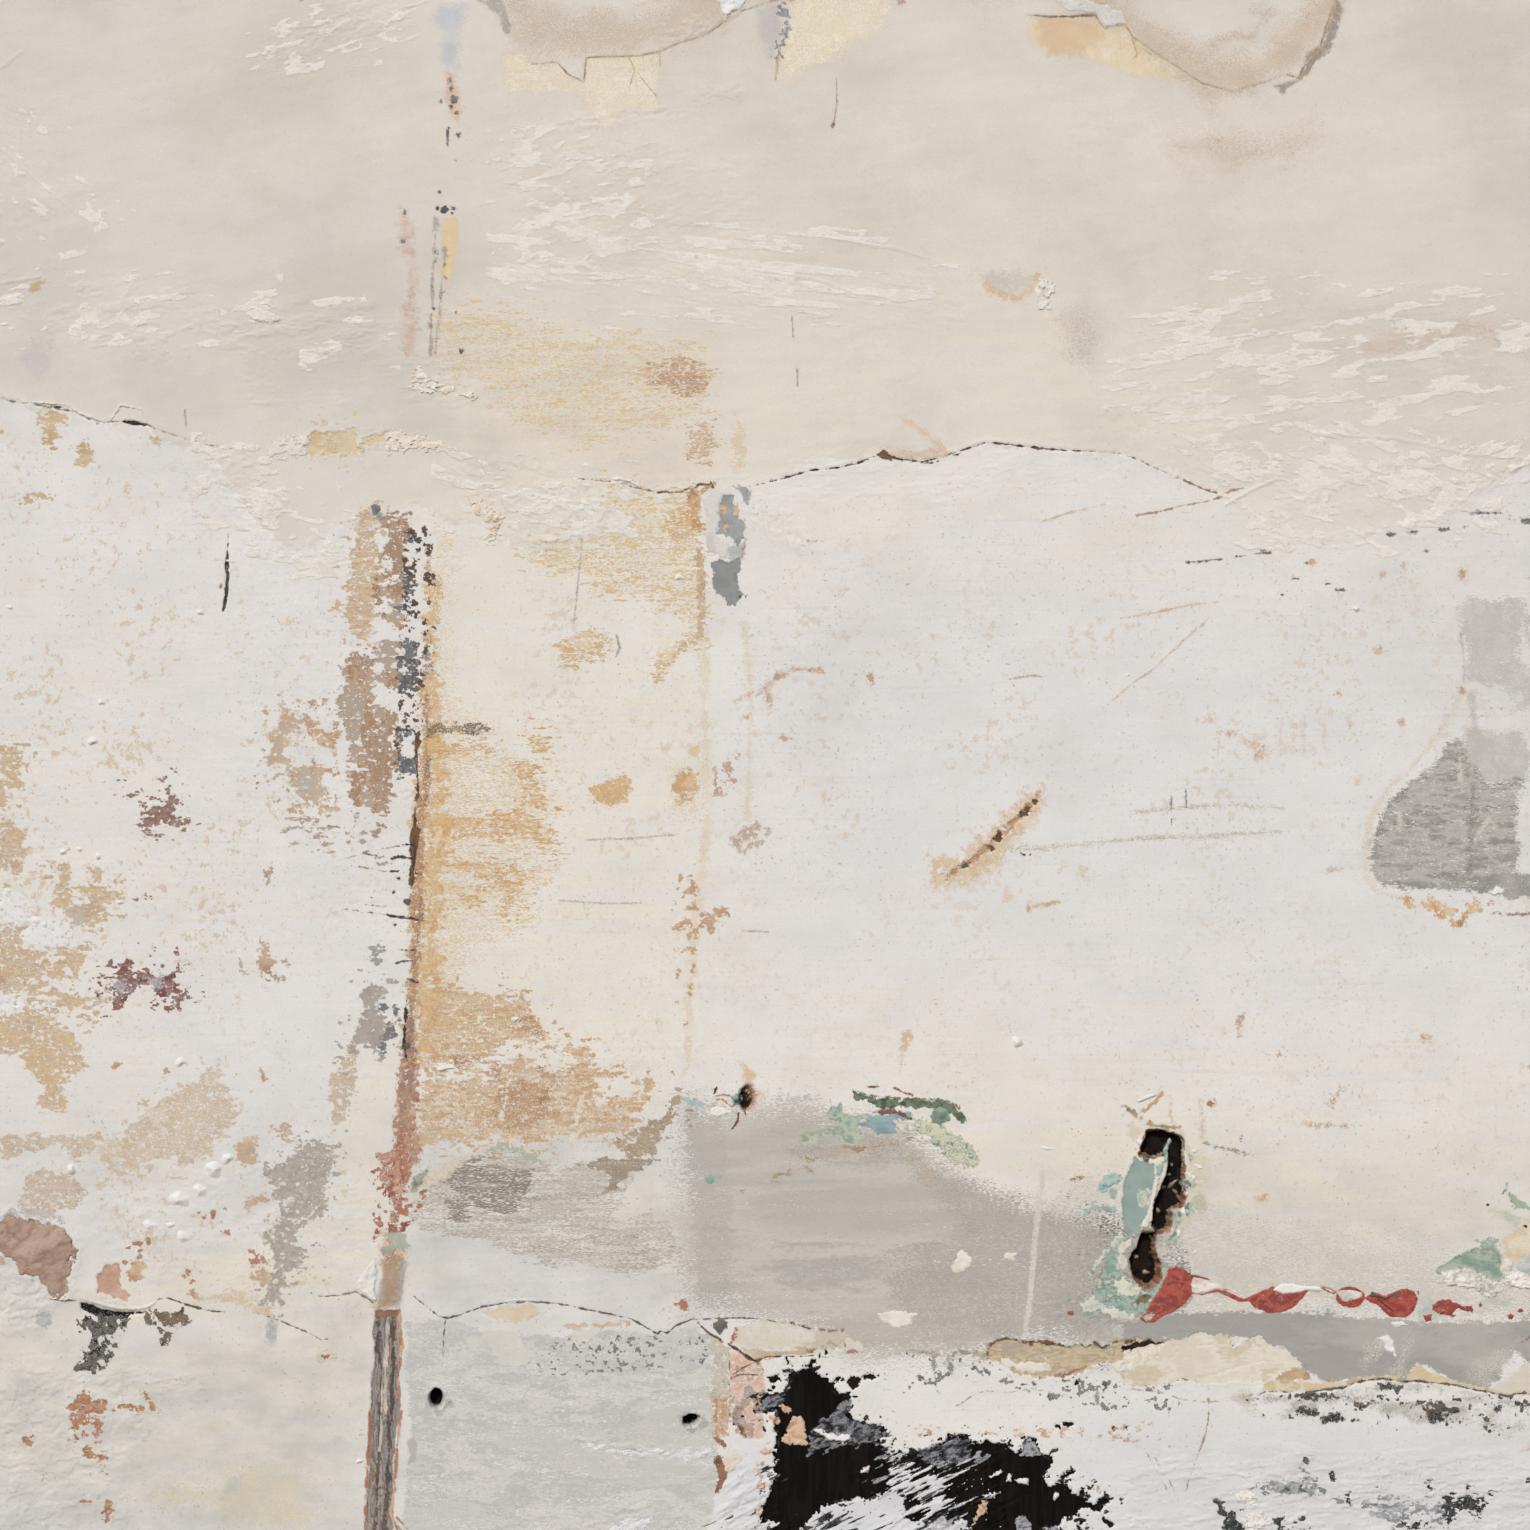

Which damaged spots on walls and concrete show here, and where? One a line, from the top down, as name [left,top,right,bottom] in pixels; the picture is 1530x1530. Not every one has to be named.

peeling [15,488,56,508]
peeling [31,405,100,467]
crack [0,397,232,449]
peeling [266,406,459,473]
crack [749,416,1243,517]
damp [1185,549,1272,564]
damp [1361,568,1530,902]
rust [923,782,1061,913]
rust [370,522,494,1310]
peeling [0,500,1530,1530]
crack [52,1297,223,1319]
crack [413,1296,828,1418]